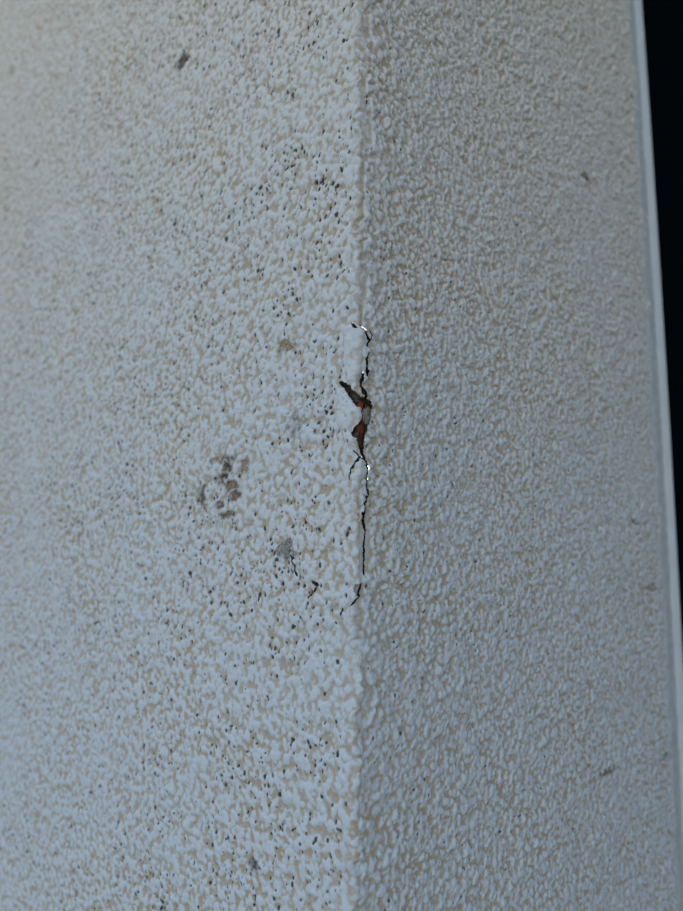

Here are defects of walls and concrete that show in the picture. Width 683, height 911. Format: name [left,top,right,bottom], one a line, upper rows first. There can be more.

crack [351,323,373,376]
crack [340,445,369,617]